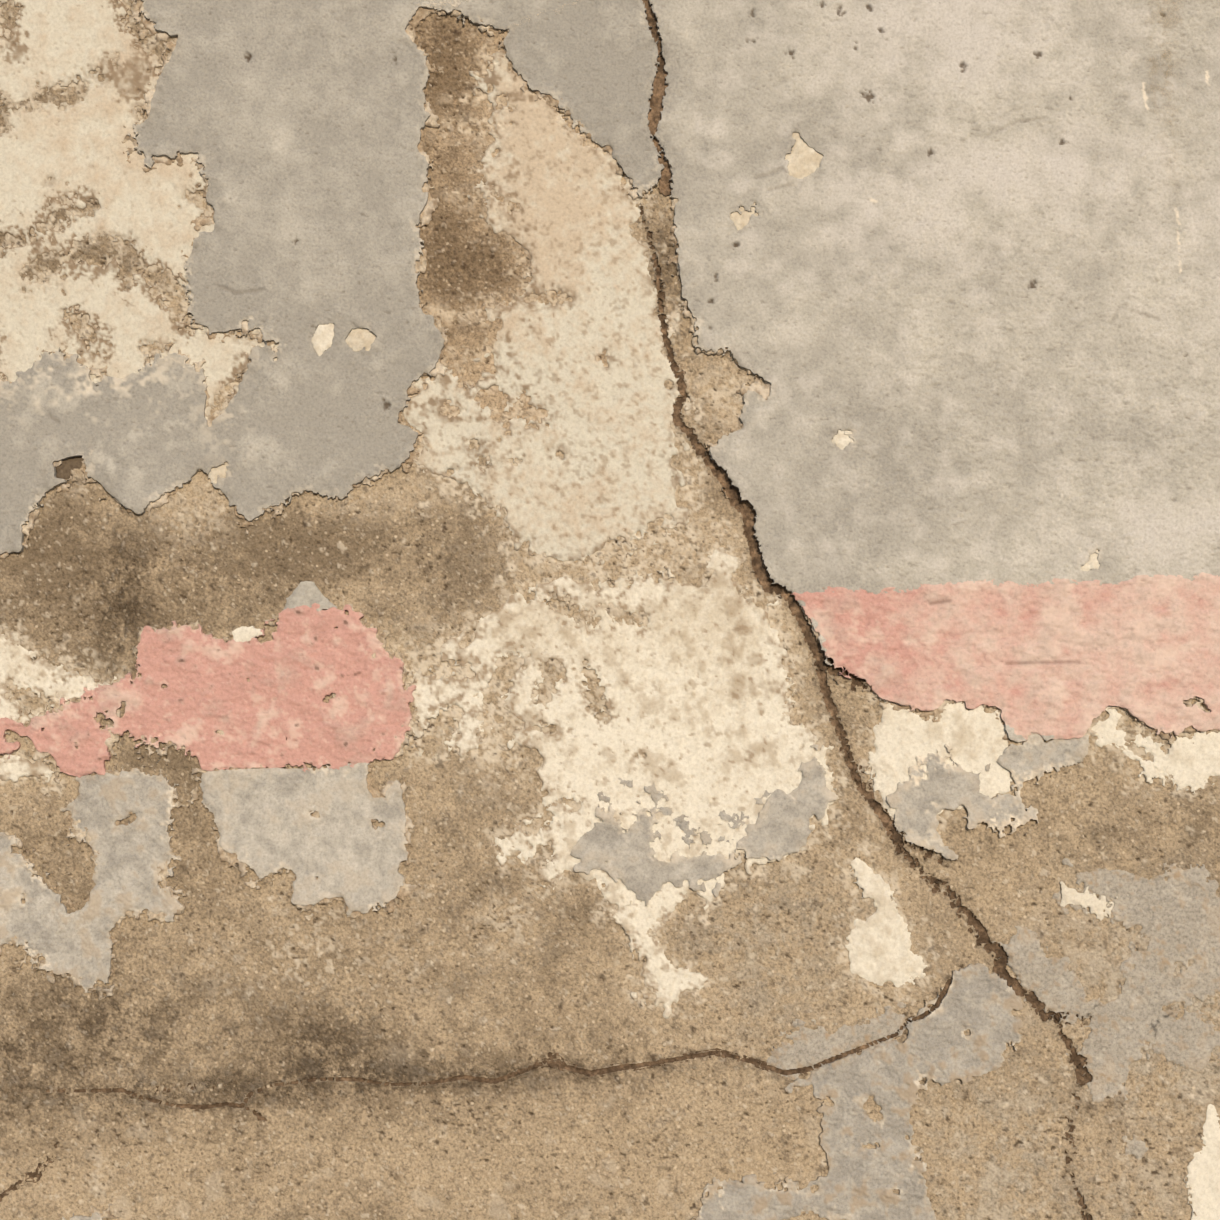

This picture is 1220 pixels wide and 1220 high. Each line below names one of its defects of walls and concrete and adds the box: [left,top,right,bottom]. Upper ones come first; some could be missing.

peeling [0,0,279,420]
peeling [399,13,766,561]
crack [21,978,953,1124]
spalling [0,421,1220,1220]
crack [640,0,1092,1220]